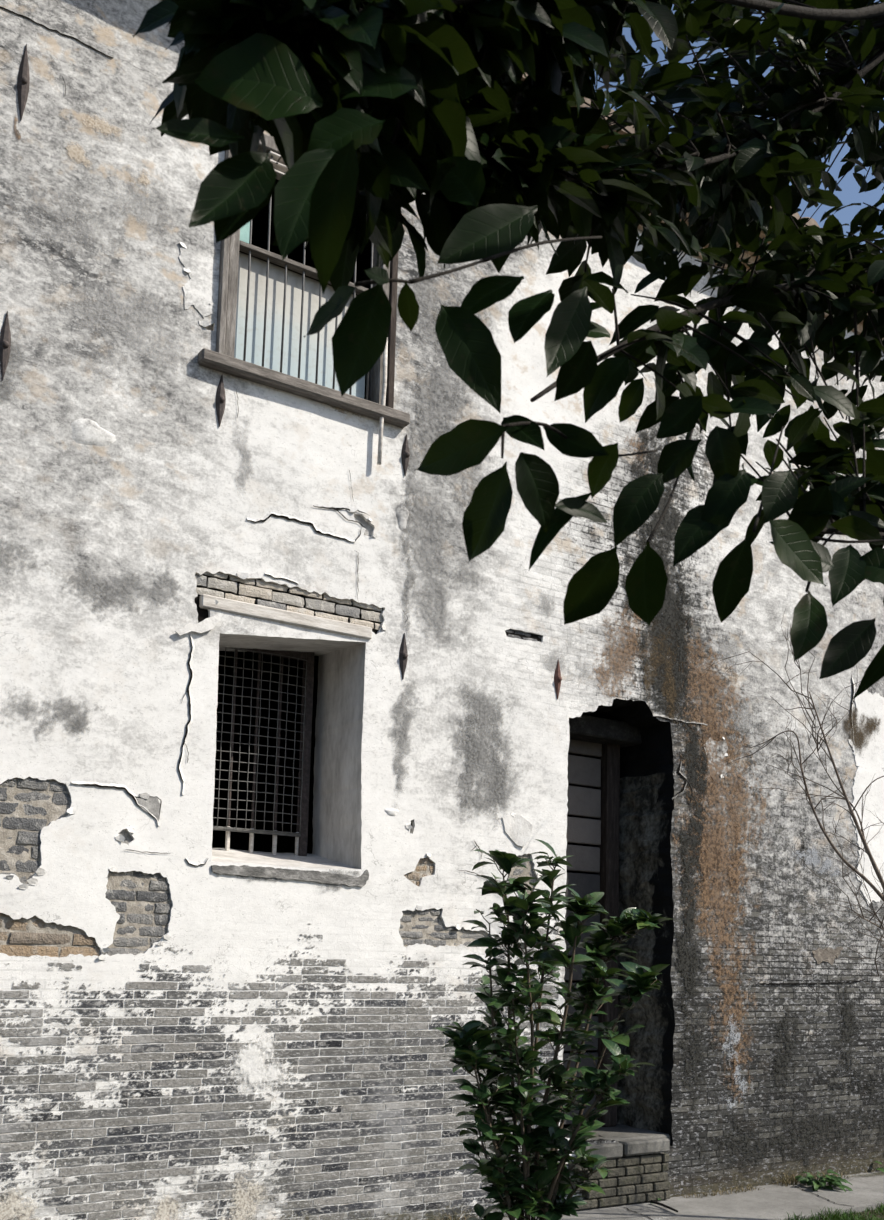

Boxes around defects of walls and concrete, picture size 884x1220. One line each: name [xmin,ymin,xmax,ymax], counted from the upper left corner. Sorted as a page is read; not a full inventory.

crack [0,6,156,76]
leakage [62,567,180,610]
crack [247,470,368,599]
spalling [0,777,77,890]
crack [71,632,208,866]
spalling [404,853,434,886]
leakage [453,685,517,819]
leakage [618,424,716,1116]
peeling [0,867,559,1220]
leakage [691,975,884,1175]